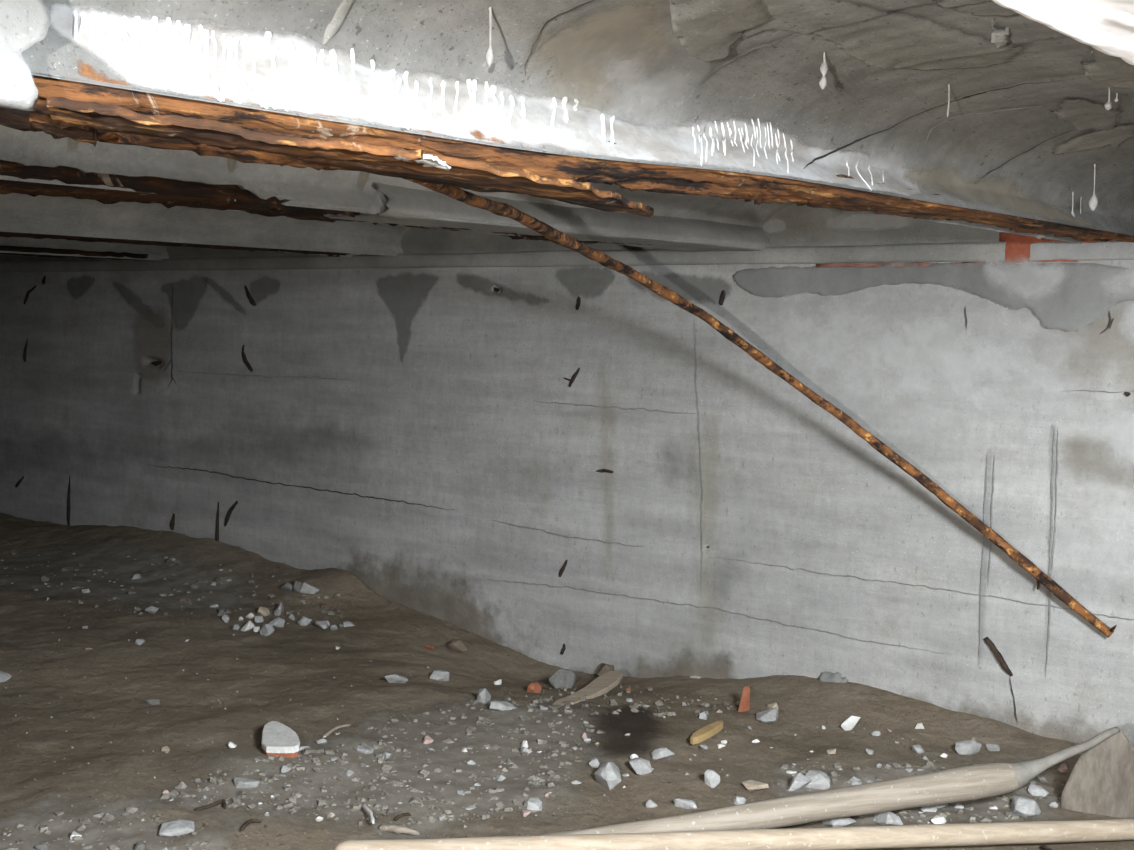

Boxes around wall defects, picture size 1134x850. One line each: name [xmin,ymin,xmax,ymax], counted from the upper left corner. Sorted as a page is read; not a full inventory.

crack [525,0,594,75]
water stain [0,51,31,100]
corrosion [29,113,98,147]
water stain [50,4,1088,225]
crack [804,81,1056,169]
crack [977,129,1075,183]
water stain [115,278,243,329]
water stain [378,274,438,359]
water stain [458,276,547,303]
corrosion [394,154,1117,638]